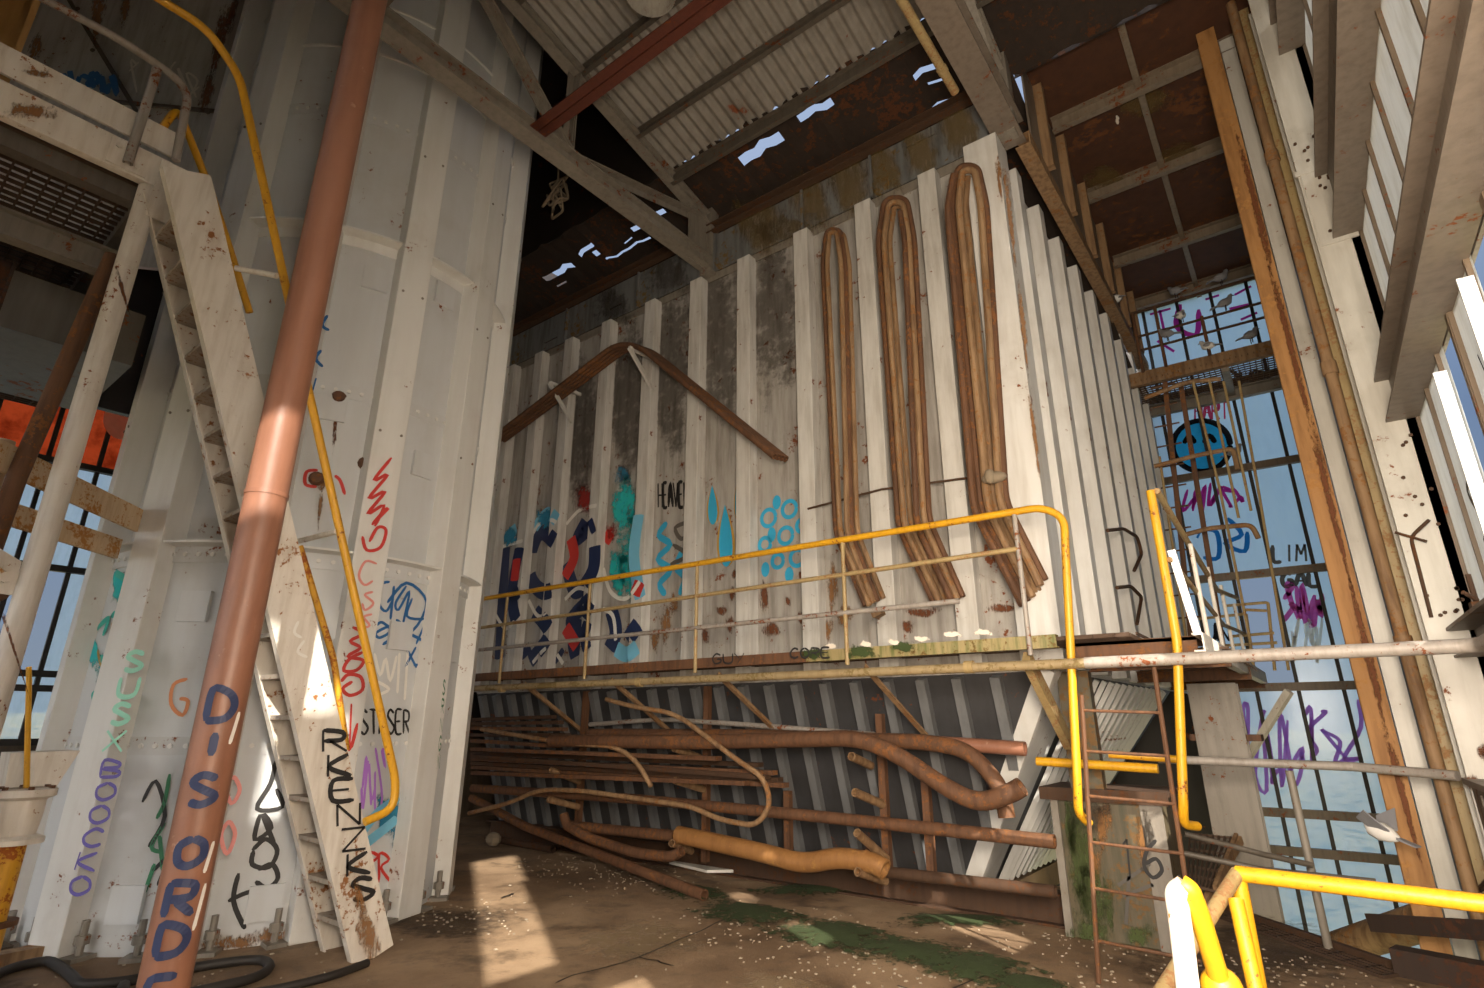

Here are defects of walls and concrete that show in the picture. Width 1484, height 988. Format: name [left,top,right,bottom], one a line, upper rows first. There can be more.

rust [91,0,130,44]
rust [26,35,48,77]
rust [11,103,56,119]
rust [1236,134,1421,860]
rust [354,885,381,960]